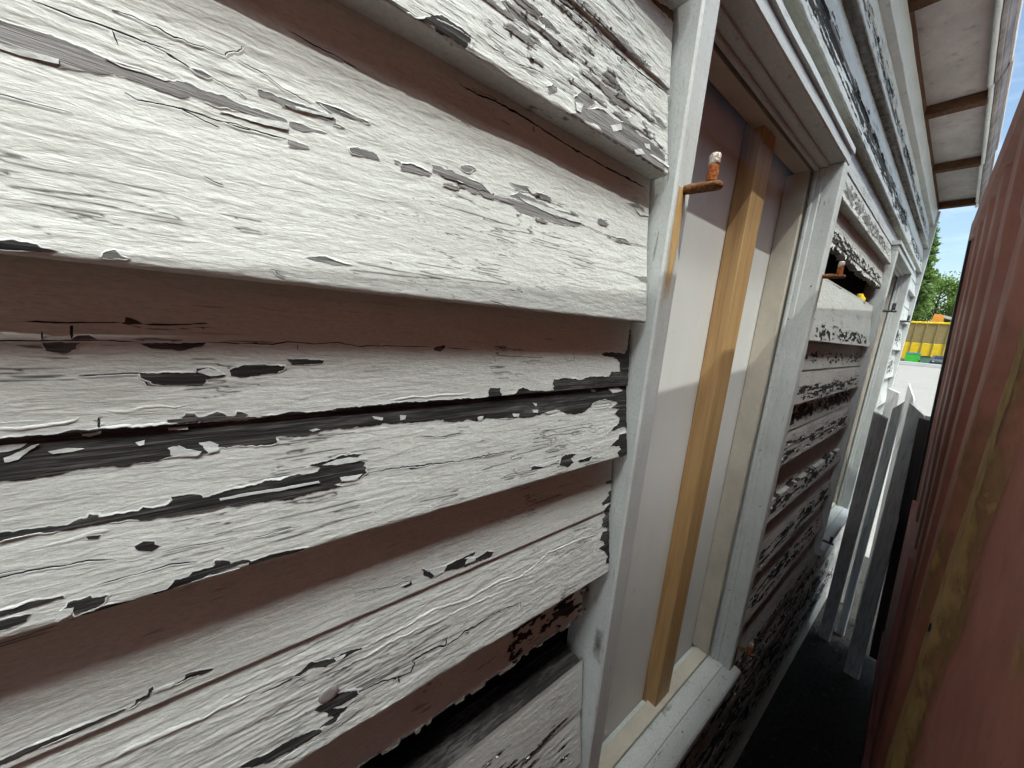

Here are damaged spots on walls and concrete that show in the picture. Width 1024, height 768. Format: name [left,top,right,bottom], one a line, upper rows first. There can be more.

peeling [0,19,371,150]
peeling [406,12,481,60]
peeling [348,146,584,228]
crack [458,84,646,189]
peeling [480,0,669,173]
peeling [806,0,928,270]
peeling [0,238,60,254]
peeling [0,328,631,483]
peeling [781,318,867,463]
peeling [0,452,368,544]
peeling [0,593,137,632]
peeling [152,546,310,594]